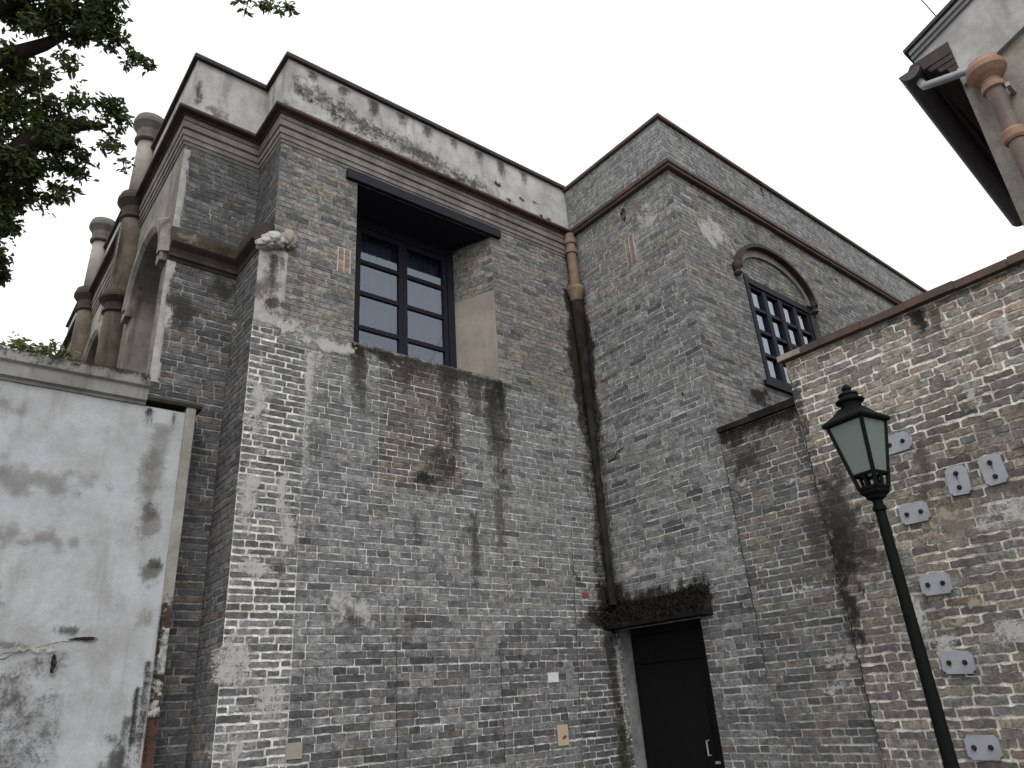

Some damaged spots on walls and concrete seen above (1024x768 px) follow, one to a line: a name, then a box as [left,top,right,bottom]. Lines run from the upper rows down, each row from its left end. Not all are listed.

water stain [294,71,489,194]
water stain [349,342,546,490]
water stain [538,283,764,612]
crack [0,640,72,660]
flaking render [141,593,174,768]
water stain [801,462,885,668]